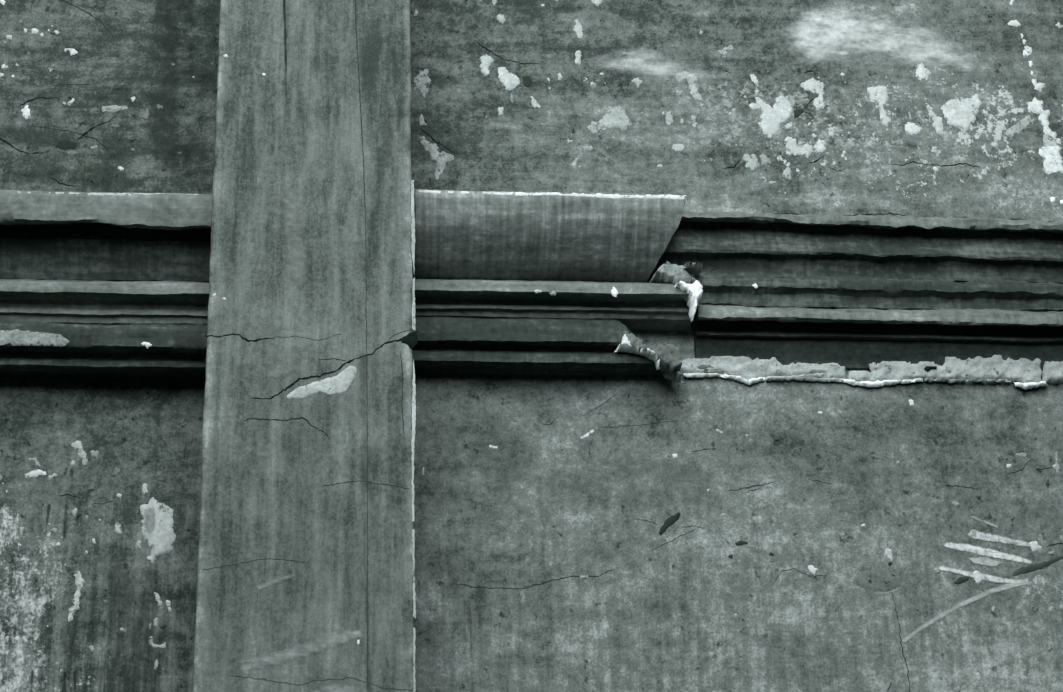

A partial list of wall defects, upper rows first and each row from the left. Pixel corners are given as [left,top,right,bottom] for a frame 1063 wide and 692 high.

crack [0,84,115,156]
peeling [419,114,454,180]
peeling [479,54,519,115]
peeling [730,73,899,184]
peeling [905,94,981,135]
flaking render [650,261,703,322]
crack [204,0,414,692]
flaking render [614,331,1063,390]
peeling [25,458,57,480]
peeling [135,483,176,563]
spalling [1012,535,1063,576]
peeling [0,508,85,692]